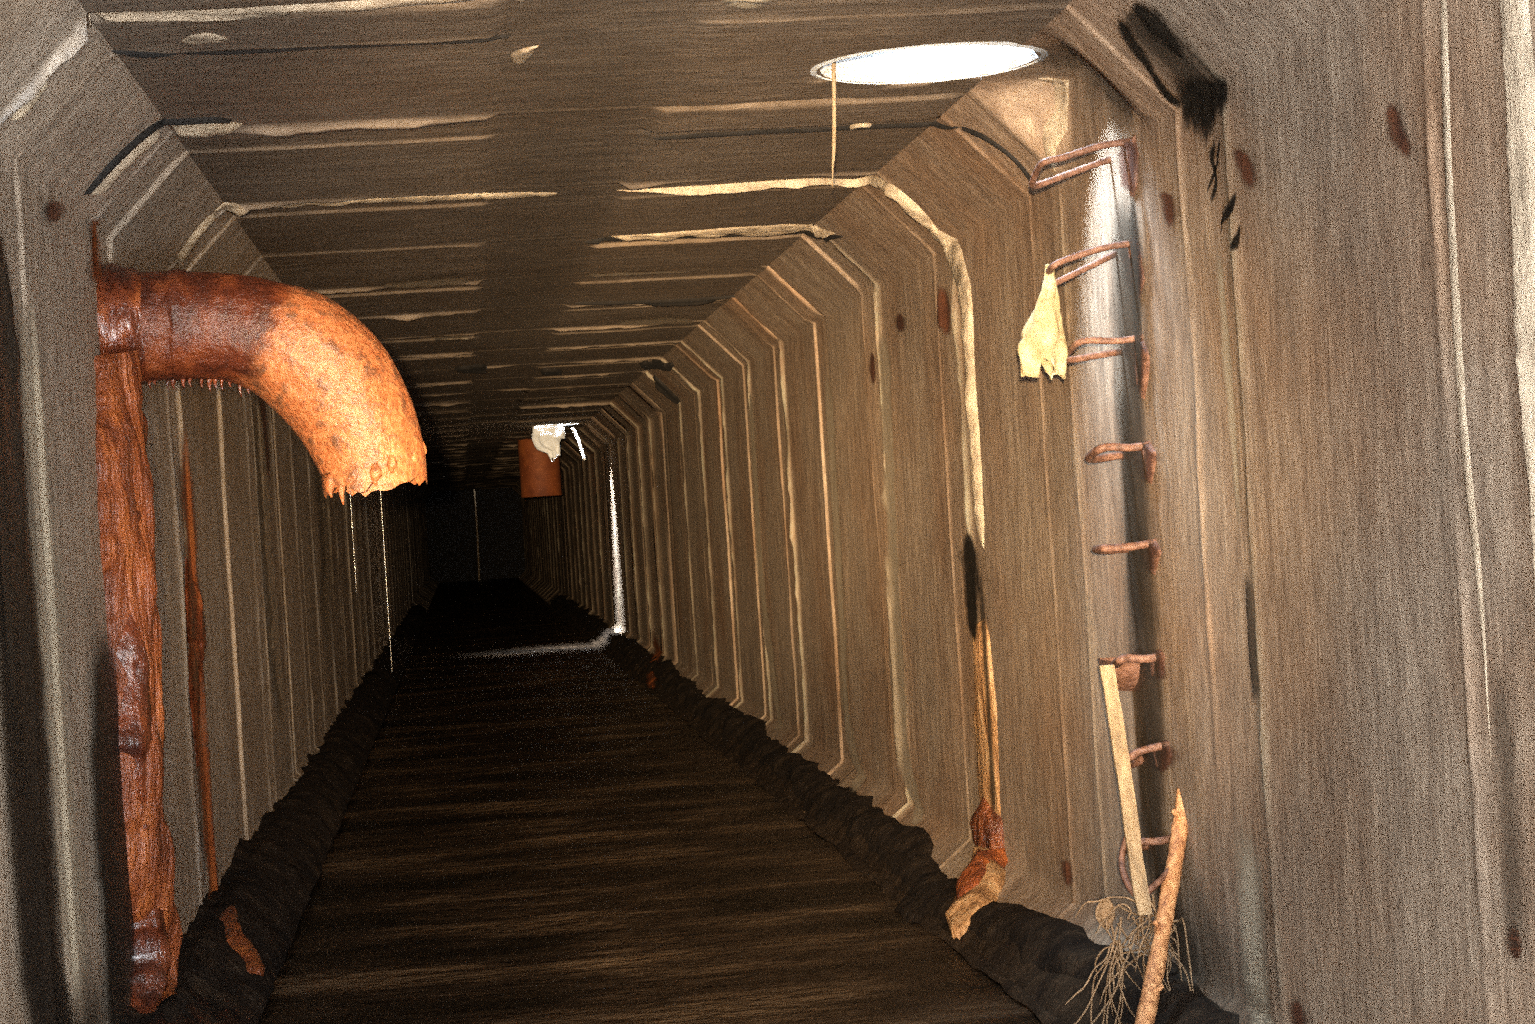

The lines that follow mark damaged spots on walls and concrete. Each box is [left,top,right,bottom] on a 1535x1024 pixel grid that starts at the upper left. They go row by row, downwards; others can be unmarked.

water stain [1118,4,1228,142]
corrosion [1118,134,1139,197]
corrosion [1160,193,1174,225]
corrosion [1134,339,1150,400]
corrosion [94,349,270,1014]
corrosion [1098,649,1165,691]
corrosion [945,586,1008,939]
corrosion [1153,740,1173,772]